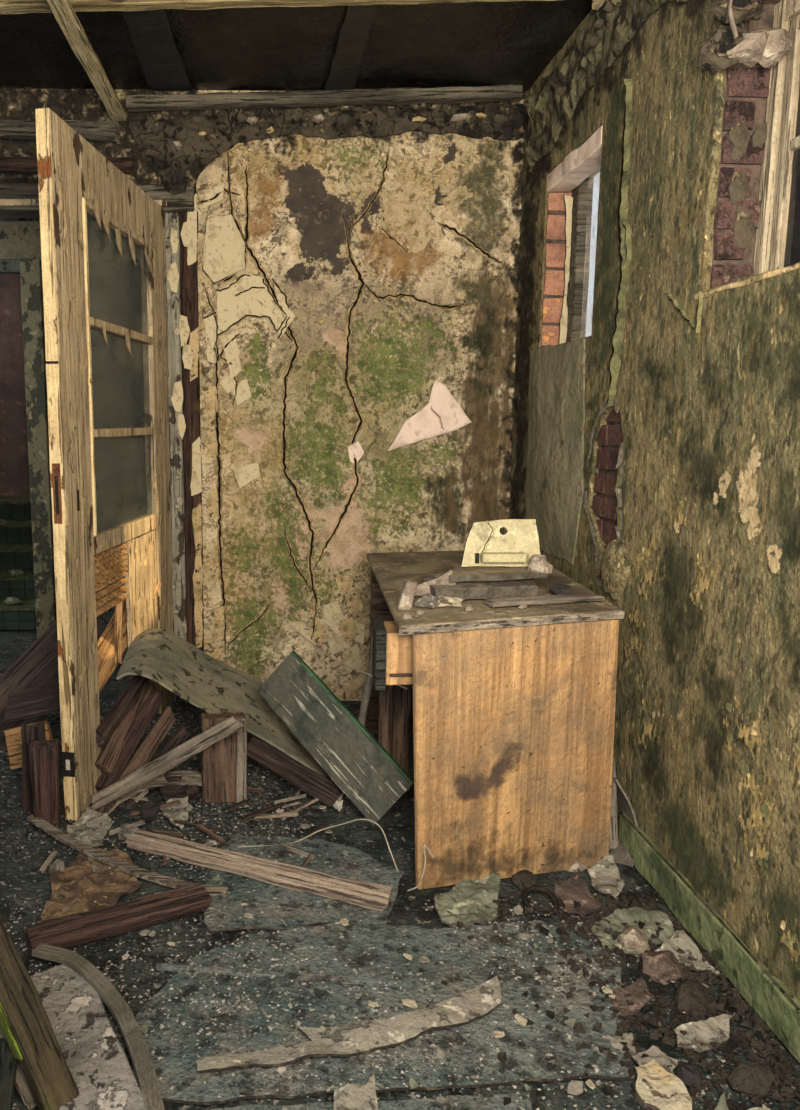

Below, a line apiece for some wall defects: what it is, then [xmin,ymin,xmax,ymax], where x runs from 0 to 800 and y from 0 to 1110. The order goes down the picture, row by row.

water stain [658,0,706,34]
water stain [0,28,643,535]
spalling [93,0,688,457]
crack [437,222,501,264]
flaking render [697,0,793,289]
flaking render [234,424,375,674]
crack [198,149,470,655]
crack [478,520,495,564]
spalling [583,400,624,587]
flaking render [713,435,782,578]
peeling [722,697,784,878]
peeling [767,909,800,970]